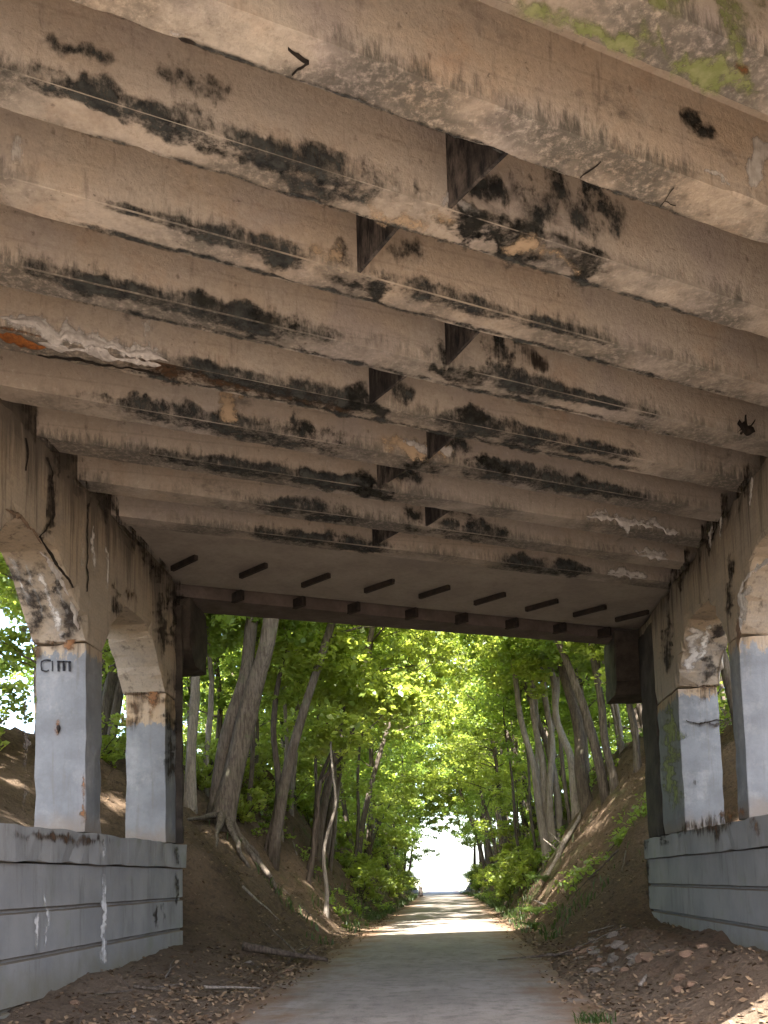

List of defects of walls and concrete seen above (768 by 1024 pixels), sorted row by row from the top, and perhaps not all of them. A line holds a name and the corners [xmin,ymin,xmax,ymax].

damp [24,35,695,316]
damp [679,108,716,139]
spalling [0,314,167,375]
damp [24,259,368,366]
damp [86,201,660,554]
crack [25,438,89,592]
damp [438,511,592,578]
spalling [607,567,647,579]
spalling [587,509,679,535]
spalling [682,558,768,682]